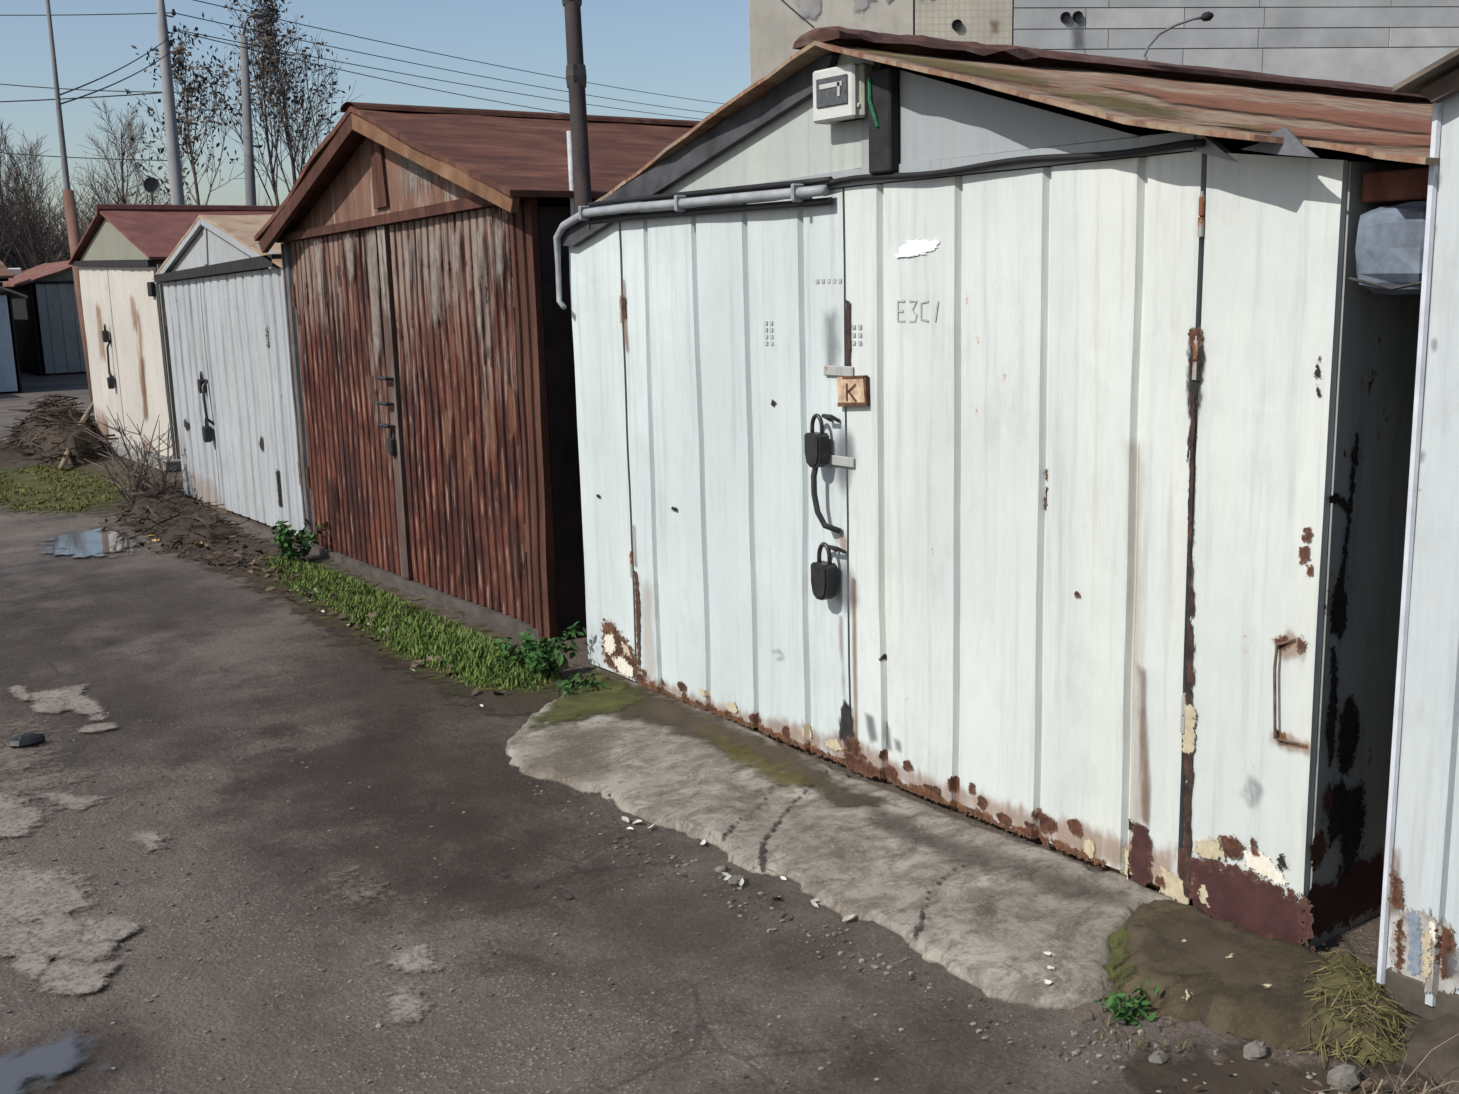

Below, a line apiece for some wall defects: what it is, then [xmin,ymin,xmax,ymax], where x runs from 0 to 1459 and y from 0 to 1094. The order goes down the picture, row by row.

corrosion [1182,326,1205,897]
corrosion [1272,634,1306,655]
crack [721,769,827,871]
peeling [599,619,1107,869]
corrosion [1140,671,1149,823]
crack [913,856,1007,938]